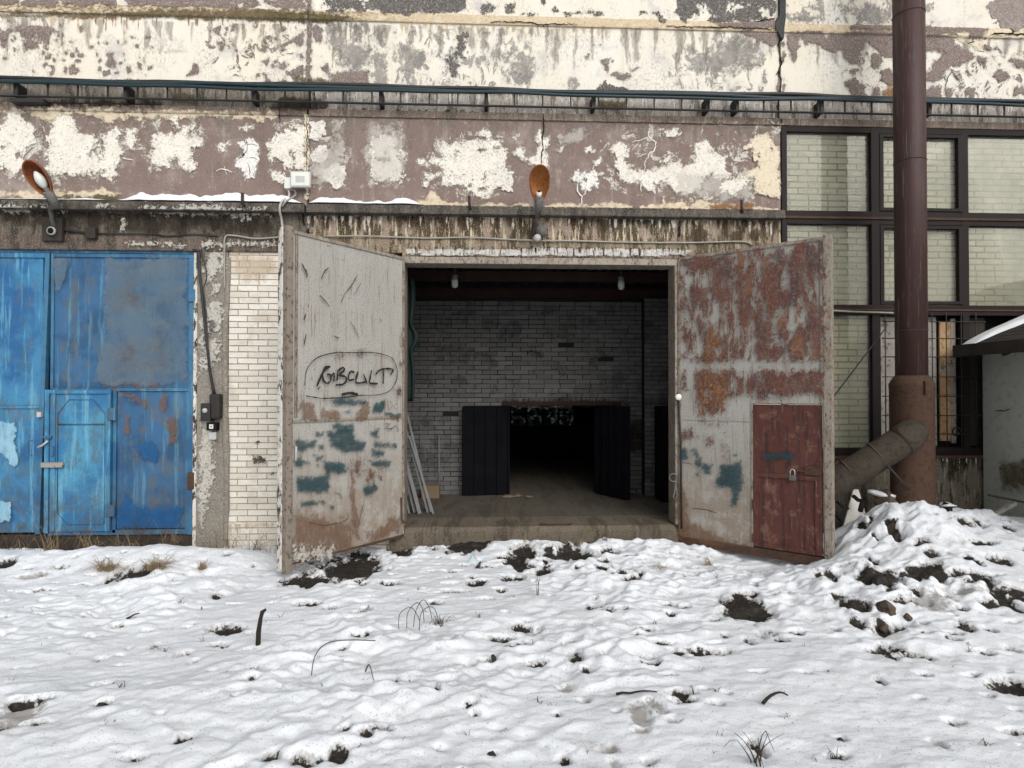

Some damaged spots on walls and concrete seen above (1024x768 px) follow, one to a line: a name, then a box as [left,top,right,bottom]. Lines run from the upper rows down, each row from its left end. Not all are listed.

peeling [0,0,605,89]
crack [667,18,784,119]
peeling [639,0,893,96]
peeling [926,0,1024,99]
peeling [0,105,350,200]
peeling [364,125,564,200]
peeling [572,117,784,207]
damp [544,196,779,253]
peeling [96,201,278,386]
peeling [0,421,18,467]
rust [104,382,178,444]
rust [692,322,731,419]